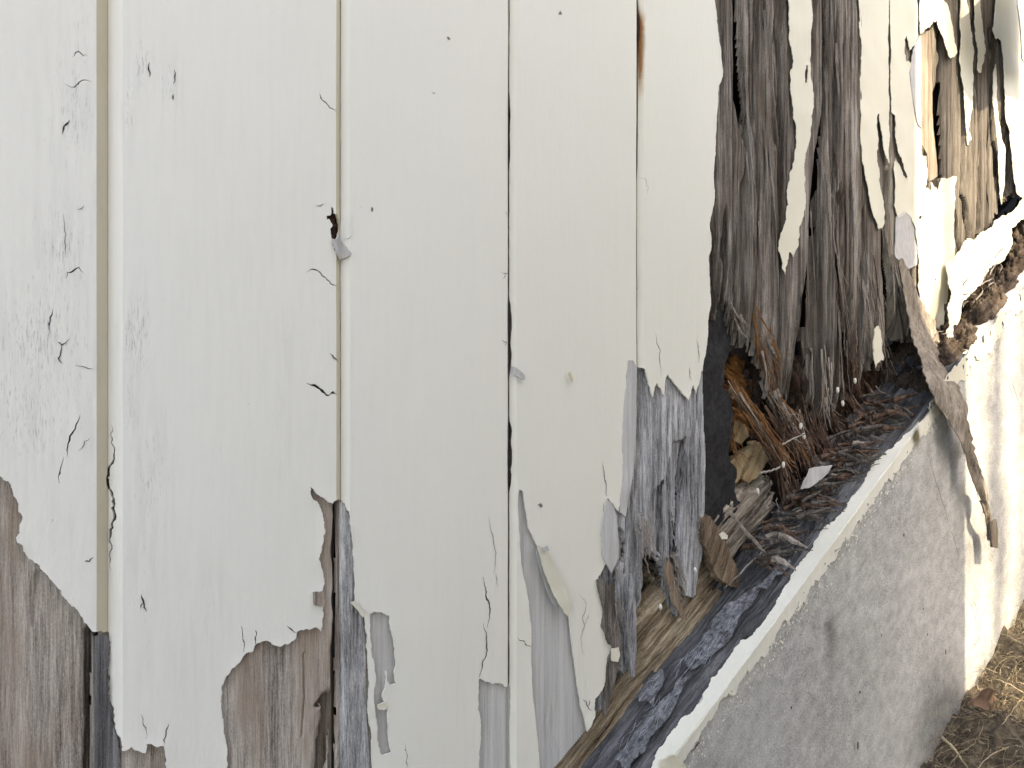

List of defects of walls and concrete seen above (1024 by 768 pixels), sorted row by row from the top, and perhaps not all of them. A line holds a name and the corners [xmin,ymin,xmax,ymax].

crack [63,206,84,279]
peeling [709,0,1024,553]
crack [48,310,93,369]
crack [309,384,335,396]
crack [58,416,90,480]
crack [86,454,117,562]
peeling [0,477,166,768]
peeling [220,488,395,768]
crack [479,521,498,676]
peeling [518,360,706,768]
peeling [478,679,511,768]